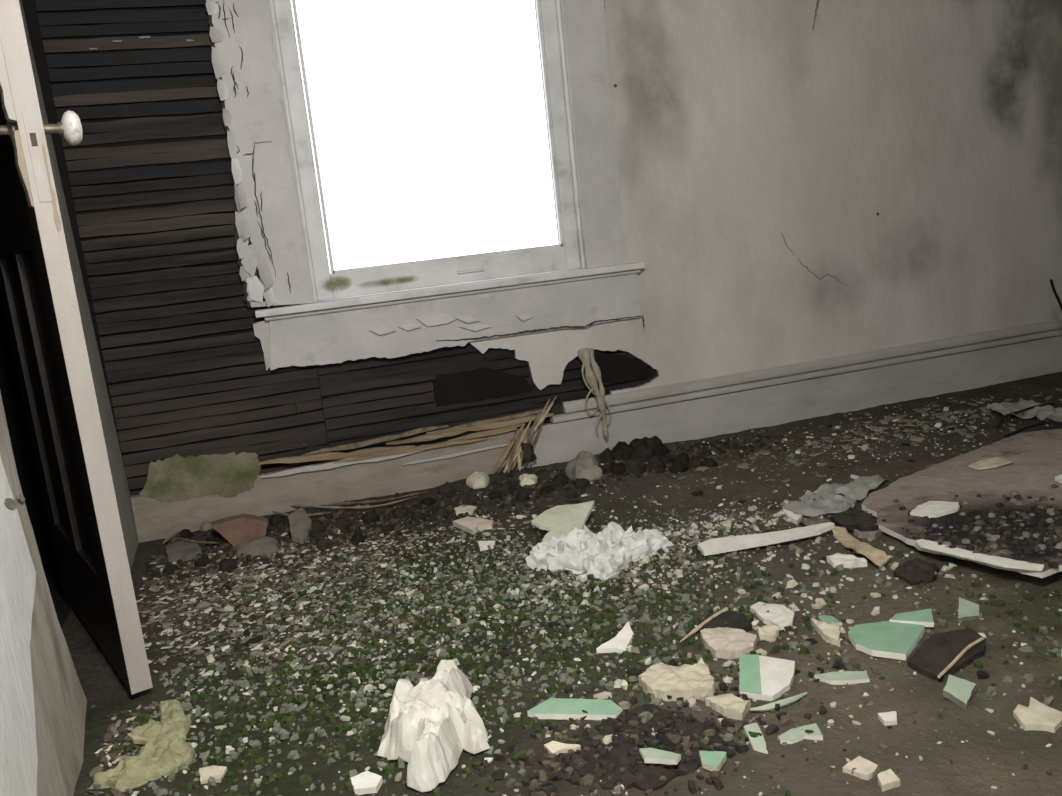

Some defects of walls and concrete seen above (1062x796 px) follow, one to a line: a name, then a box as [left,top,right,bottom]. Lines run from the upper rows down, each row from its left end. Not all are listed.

crack [812,0,820,30]
flaking render [35,0,657,496]
crack [436,315,645,341]